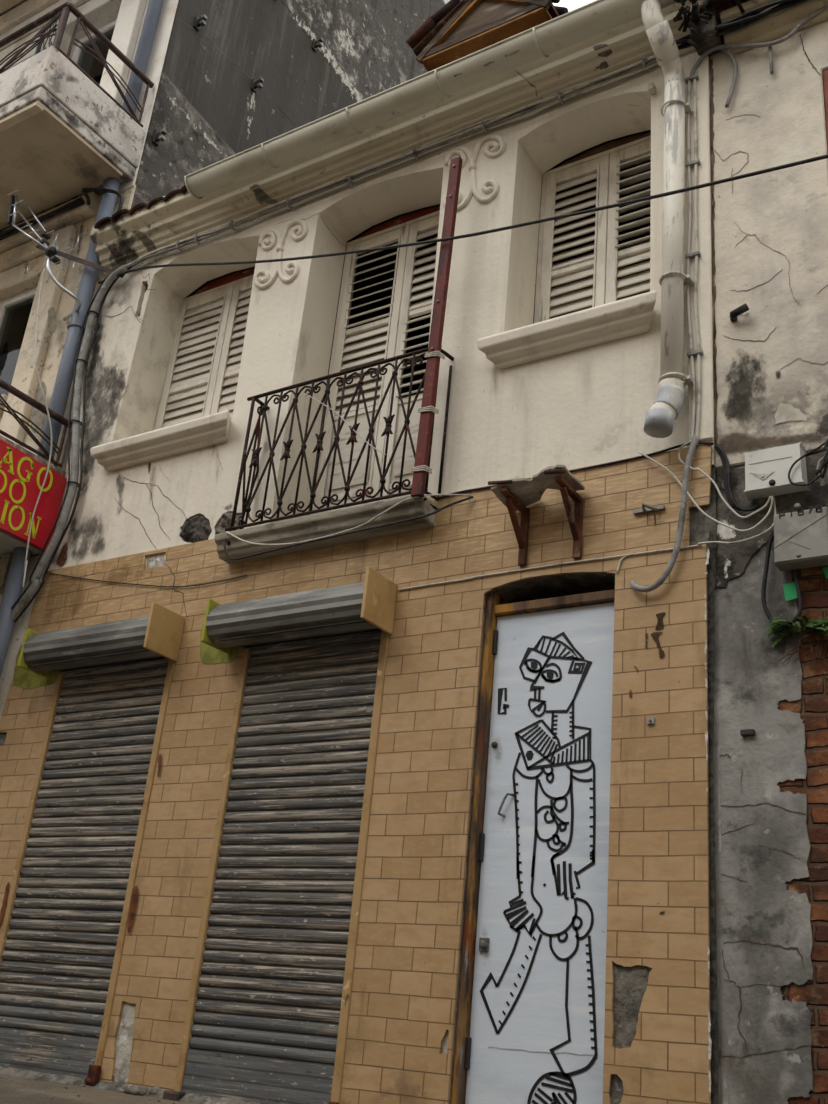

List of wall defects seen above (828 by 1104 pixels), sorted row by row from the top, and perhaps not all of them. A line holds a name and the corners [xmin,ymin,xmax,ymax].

crack [714,150,749,193]
leakage [105,240,139,266]
crack [730,222,828,304]
leakage [80,324,125,491]
leakage [705,355,828,588]
leakage [70,517,104,558]
crack [114,469,188,619]
spalling [613,963,652,1049]
spalling [610,1074,624,1104]